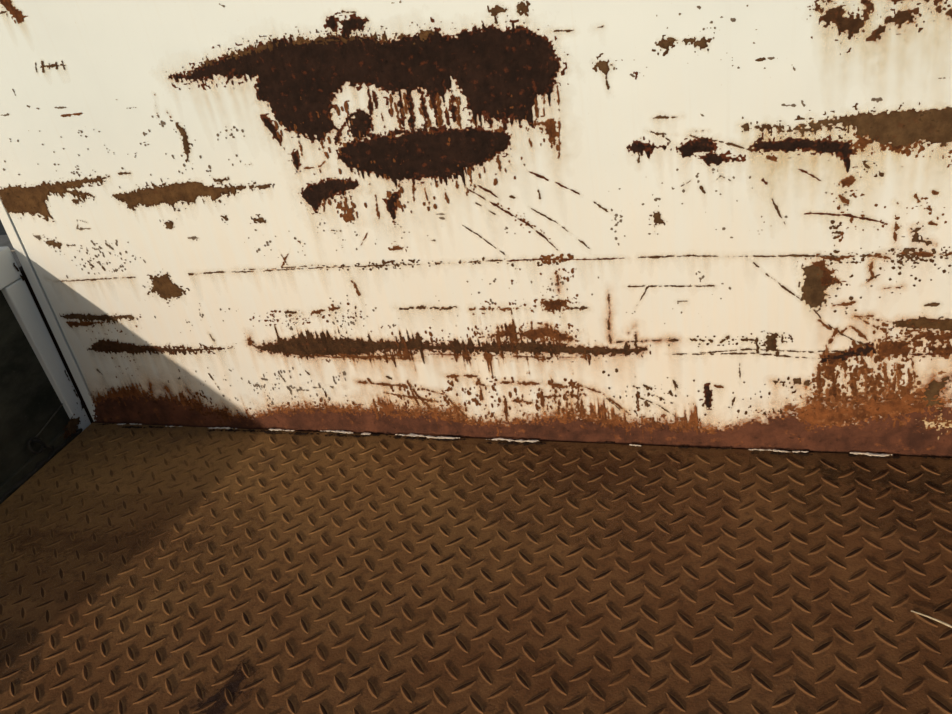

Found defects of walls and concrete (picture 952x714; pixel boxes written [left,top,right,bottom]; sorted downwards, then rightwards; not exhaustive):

corrosion [0,94,274,222]
corrosion [166,0,573,227]
corrosion [807,0,952,55]
corrosion [59,102,952,458]